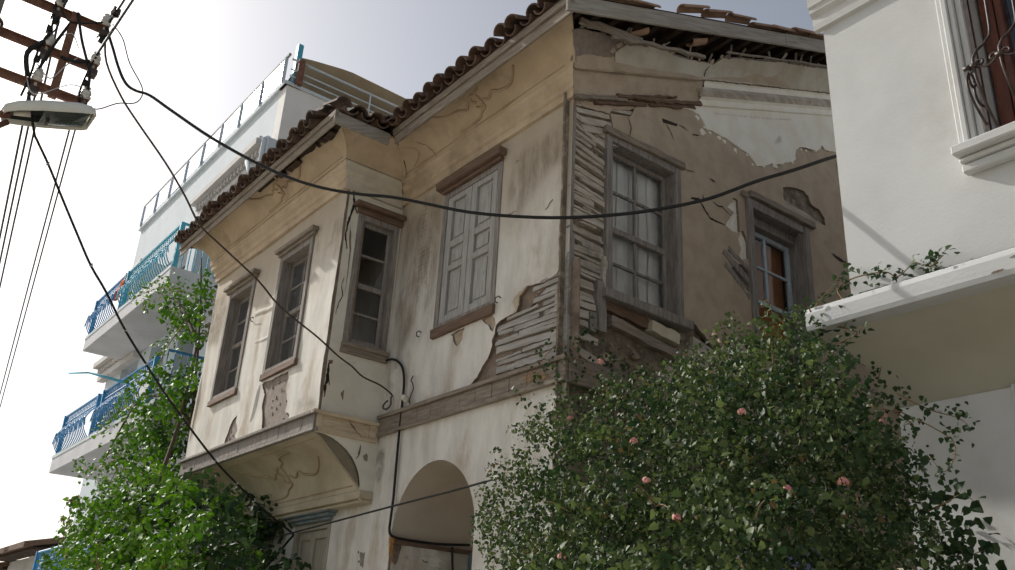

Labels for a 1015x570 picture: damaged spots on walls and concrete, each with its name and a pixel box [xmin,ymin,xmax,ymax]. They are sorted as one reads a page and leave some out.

peeling [575,41,830,94]
flaking render [476,92,836,383]
spalling [263,373,289,428]